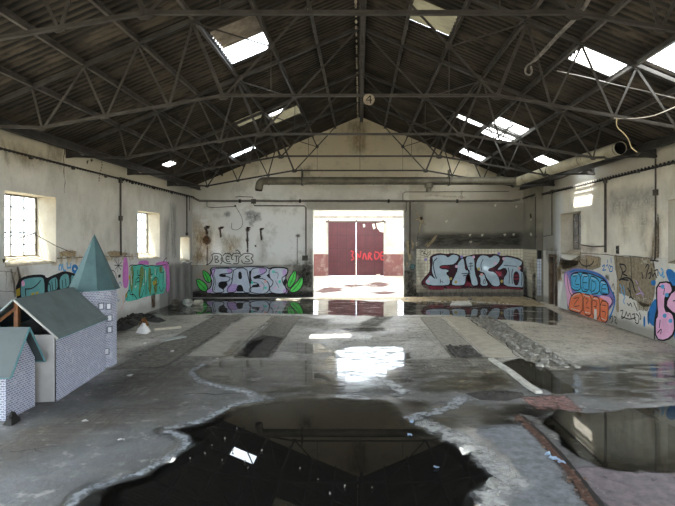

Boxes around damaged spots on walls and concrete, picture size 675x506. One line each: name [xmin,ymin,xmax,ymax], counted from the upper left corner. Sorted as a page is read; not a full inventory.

peeling [605,255,656,312]